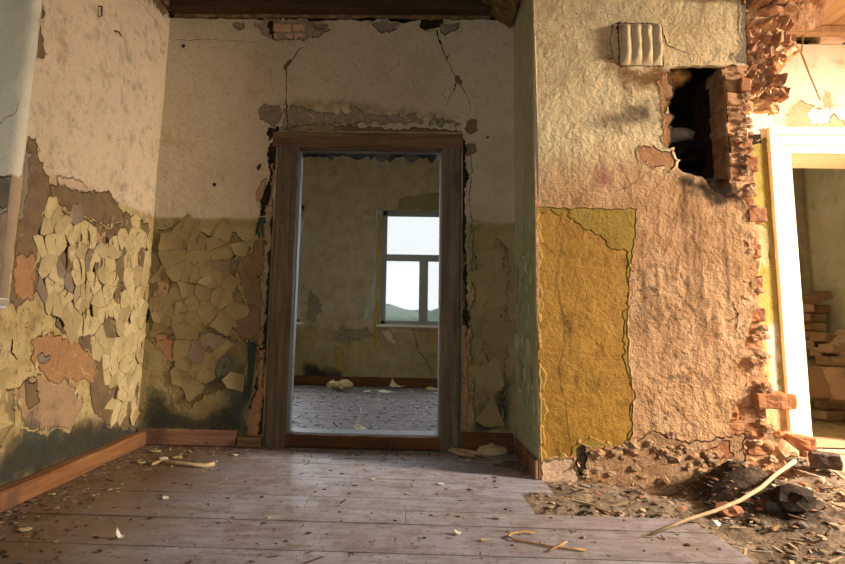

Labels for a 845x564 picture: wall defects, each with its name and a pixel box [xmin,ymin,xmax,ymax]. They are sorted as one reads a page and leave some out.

spalling [232,18,334,45]
crack [270,47,303,132]
crack [436,29,471,109]
peeling [0,102,514,449]
peeling [537,0,845,490]
leakage [0,418,131,485]